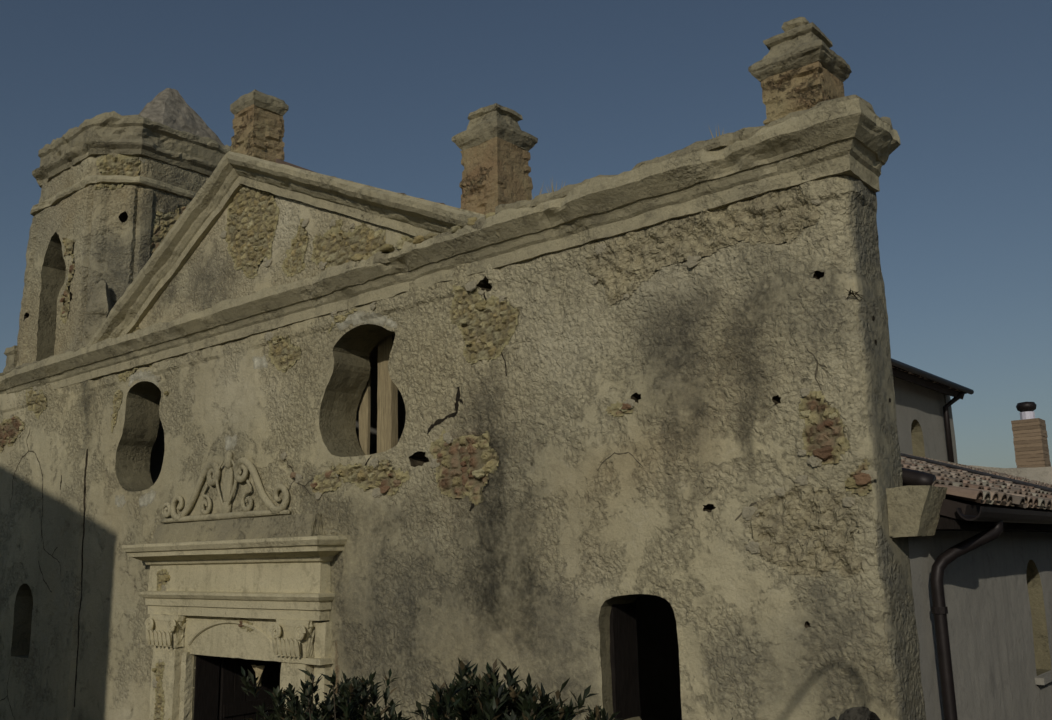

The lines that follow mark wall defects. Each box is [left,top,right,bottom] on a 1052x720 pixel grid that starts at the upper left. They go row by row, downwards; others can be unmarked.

spalling [94,154,145,190]
spalling [150,205,188,254]
spalling [220,185,386,279]
spalling [264,332,301,373]
spalling [450,275,519,364]
spalling [0,386,47,454]
crack [427,387,463,434]
spalling [290,429,499,505]
spalling [742,388,877,577]
crack [10,430,88,707]